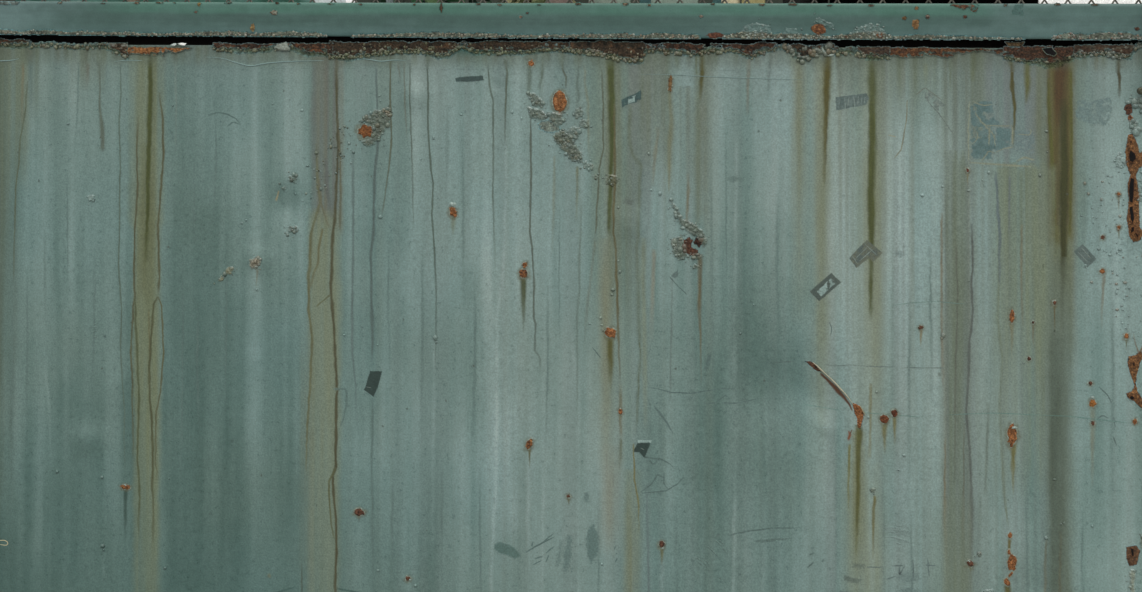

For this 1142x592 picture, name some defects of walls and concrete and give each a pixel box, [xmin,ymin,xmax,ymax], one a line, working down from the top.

rust [0,38,192,60]
rust [211,23,1142,70]
rust [548,87,571,116]
rust [1098,133,1142,243]
rust [515,258,533,335]
rust [1121,330,1142,429]
rust [1002,531,1018,592]